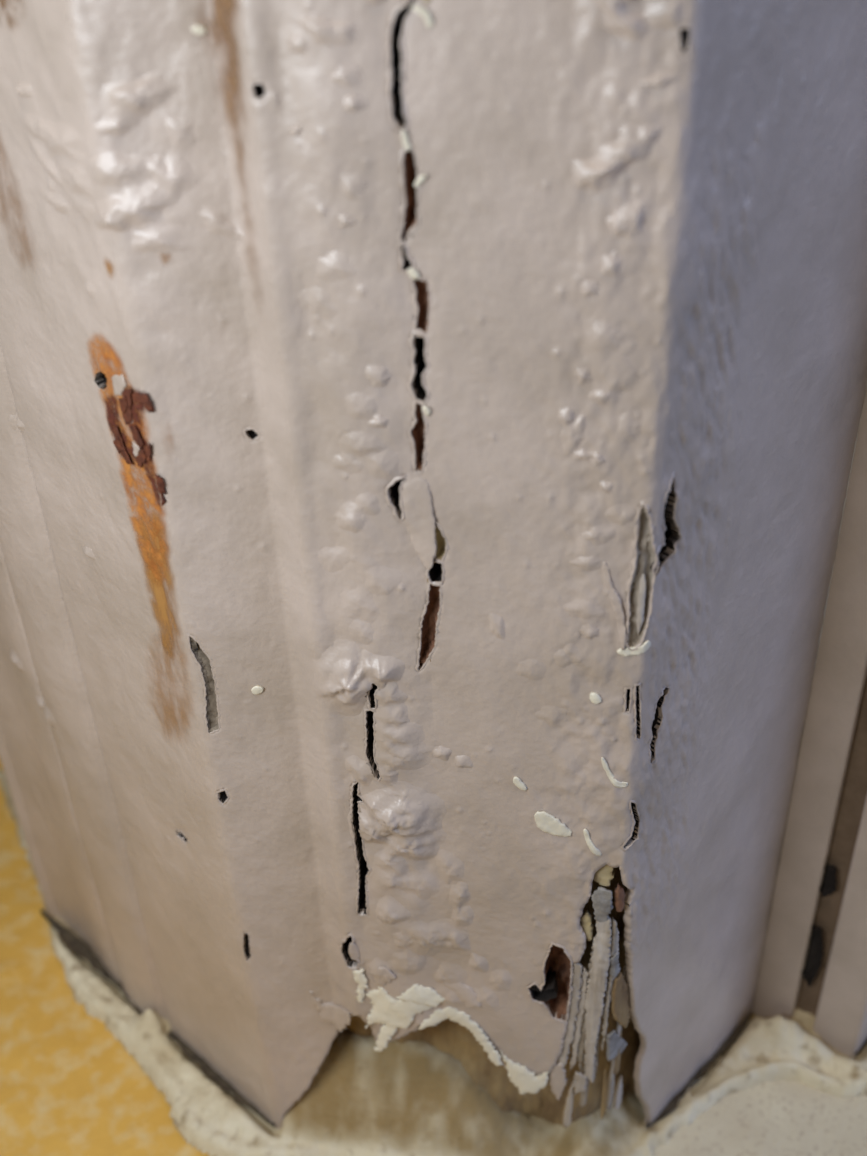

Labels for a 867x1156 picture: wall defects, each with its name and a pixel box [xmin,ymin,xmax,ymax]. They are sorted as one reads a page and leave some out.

crack [385,0,449,673]
corrosion [91,338,177,652]
crack [650,472,683,579]
crack [350,683,382,916]
crack [583,757,640,856]
crack [623,683,671,765]
peeling [309,942,567,1100]